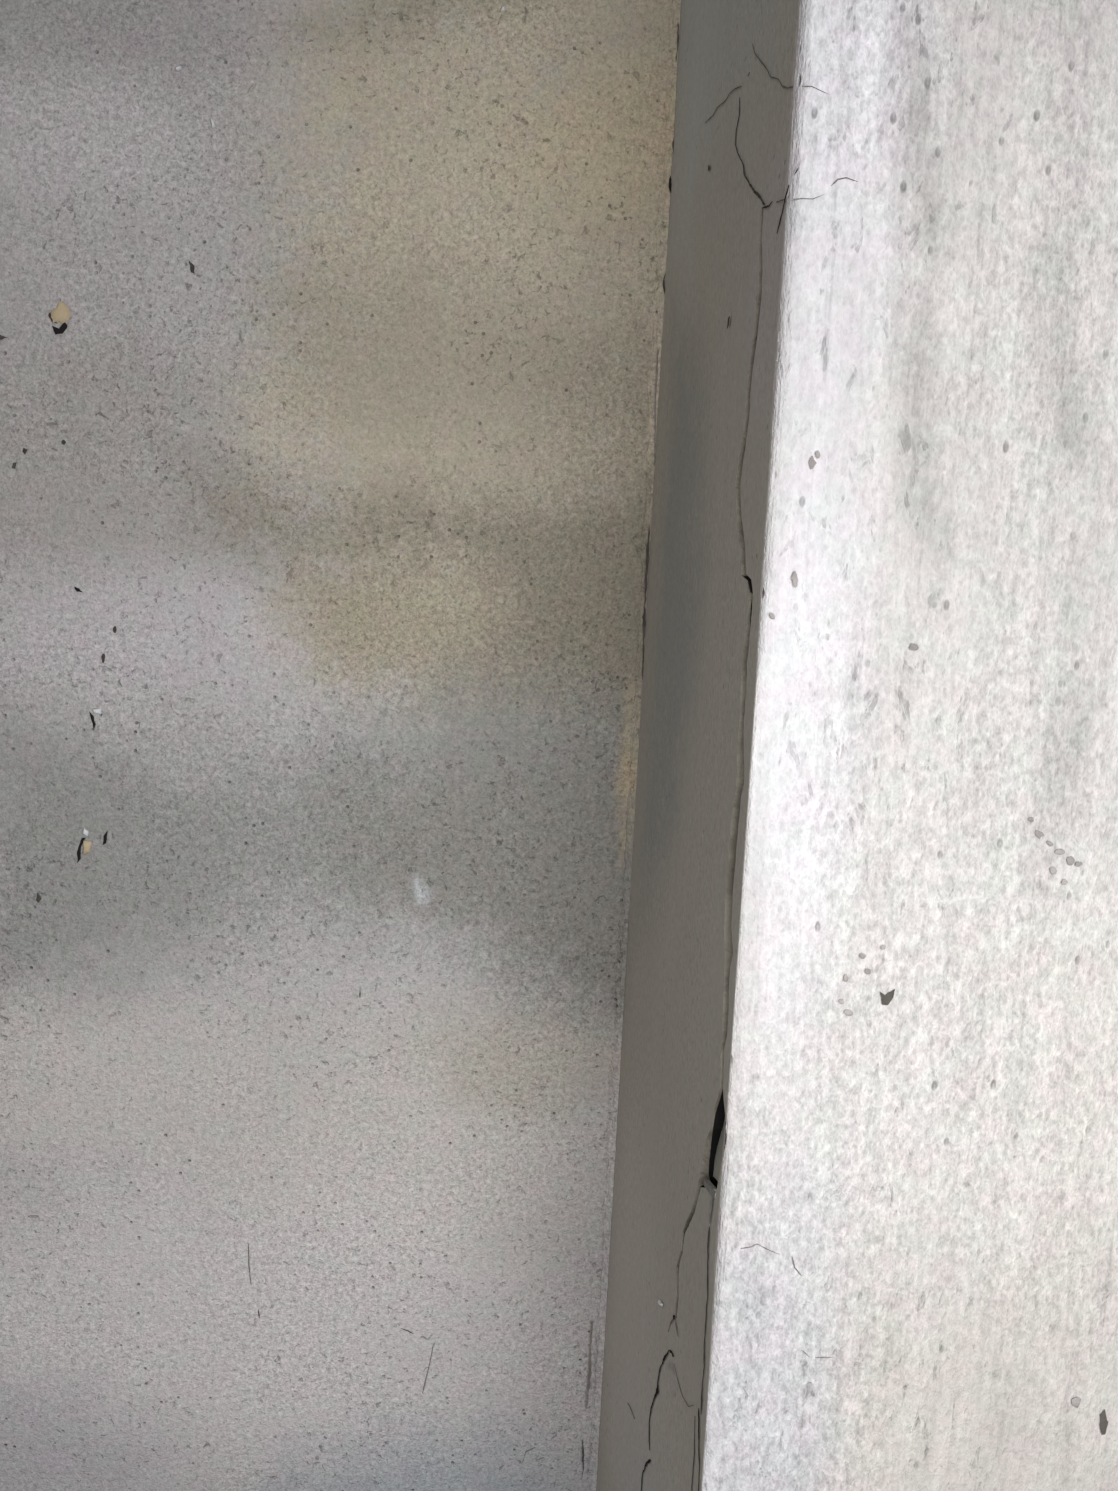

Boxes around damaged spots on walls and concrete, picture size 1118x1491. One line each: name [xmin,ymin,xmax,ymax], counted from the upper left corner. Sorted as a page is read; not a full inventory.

crack [628,44,858,1491]